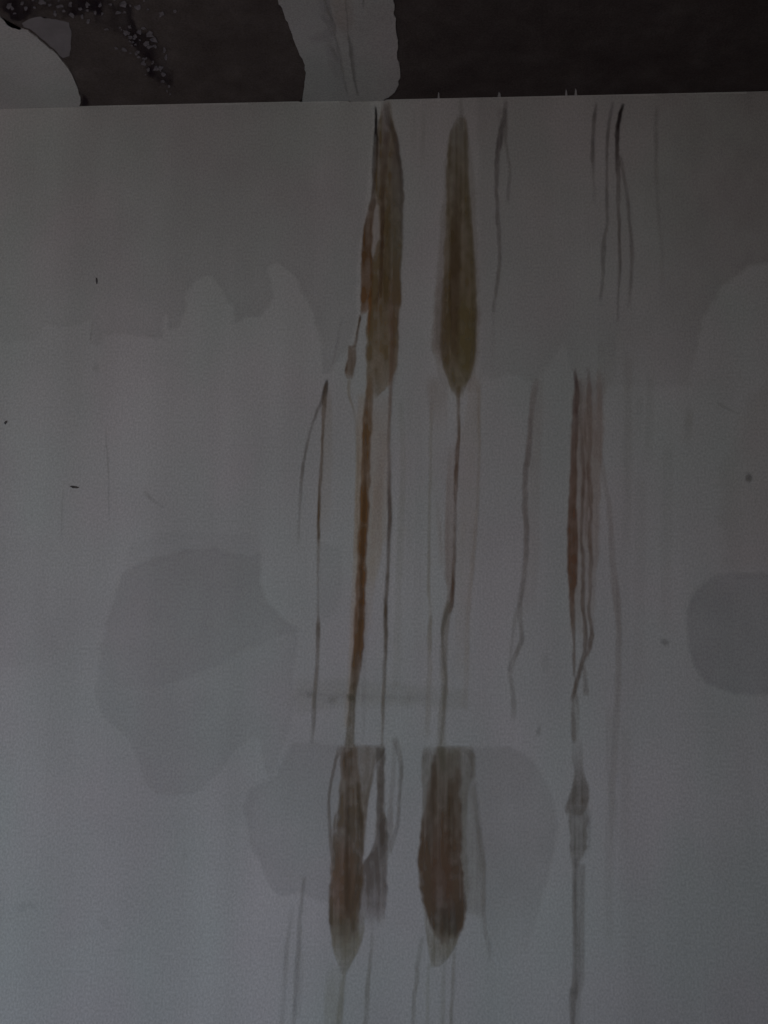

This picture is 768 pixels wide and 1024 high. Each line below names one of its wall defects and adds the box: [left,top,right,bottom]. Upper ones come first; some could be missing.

leakage [615,105,623,163]
rust [346,108,401,379]
rust [442,127,476,395]
rust [350,396,371,708]
rust [568,435,593,648]
rust [329,741,387,956]
rust [418,768,464,937]